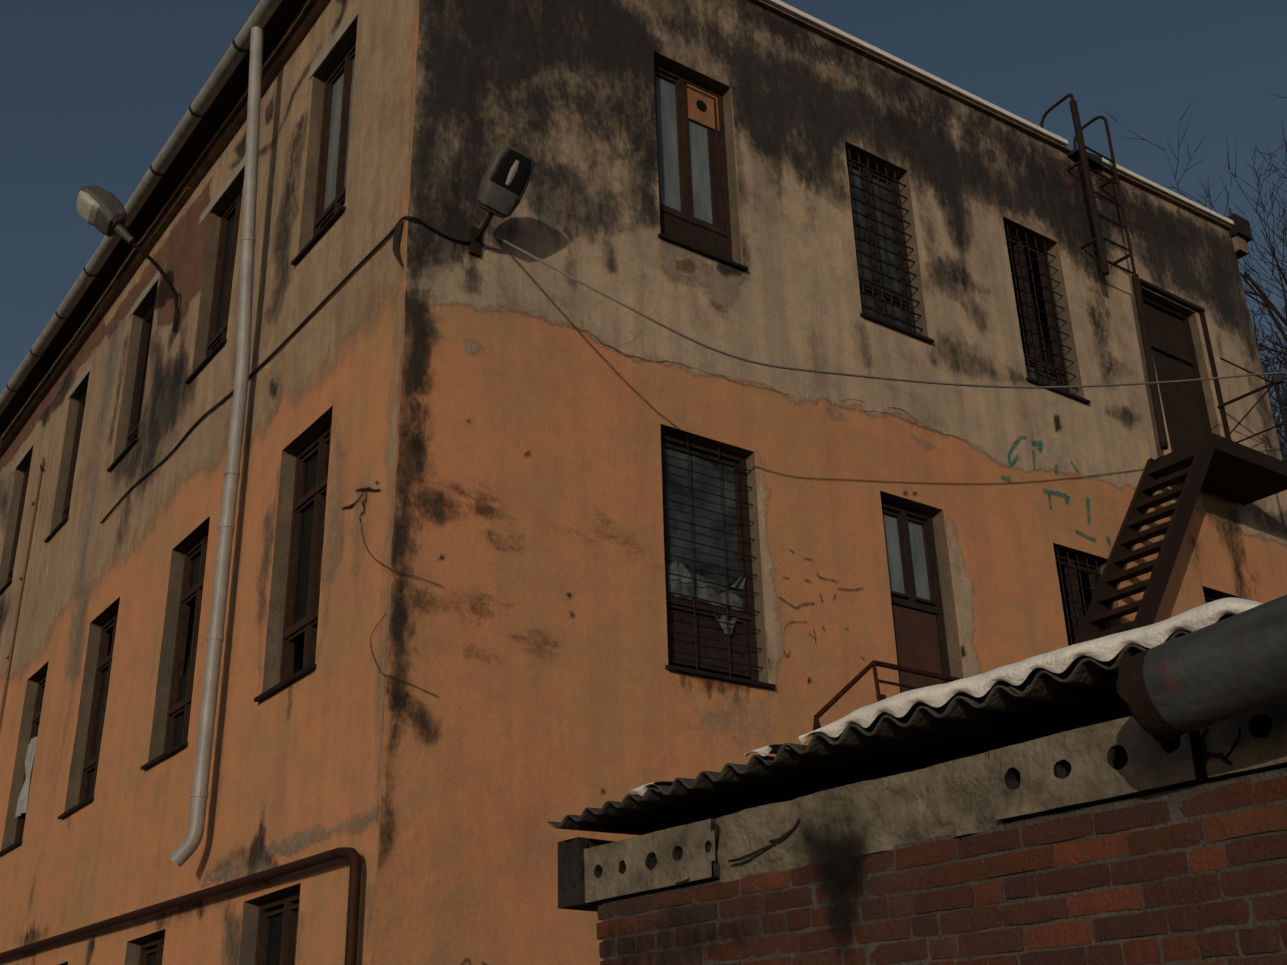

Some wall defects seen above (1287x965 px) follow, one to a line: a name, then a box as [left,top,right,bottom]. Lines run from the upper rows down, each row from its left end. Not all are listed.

damp [271,119,306,315]
damp [408,0,662,265]
damp [658,0,1258,361]
peeling [0,119,247,678]
damp [115,340,192,489]
peeling [244,0,1287,786]
damp [1114,407,1134,425]
damp [258,499,276,619]
damp [387,690,437,742]